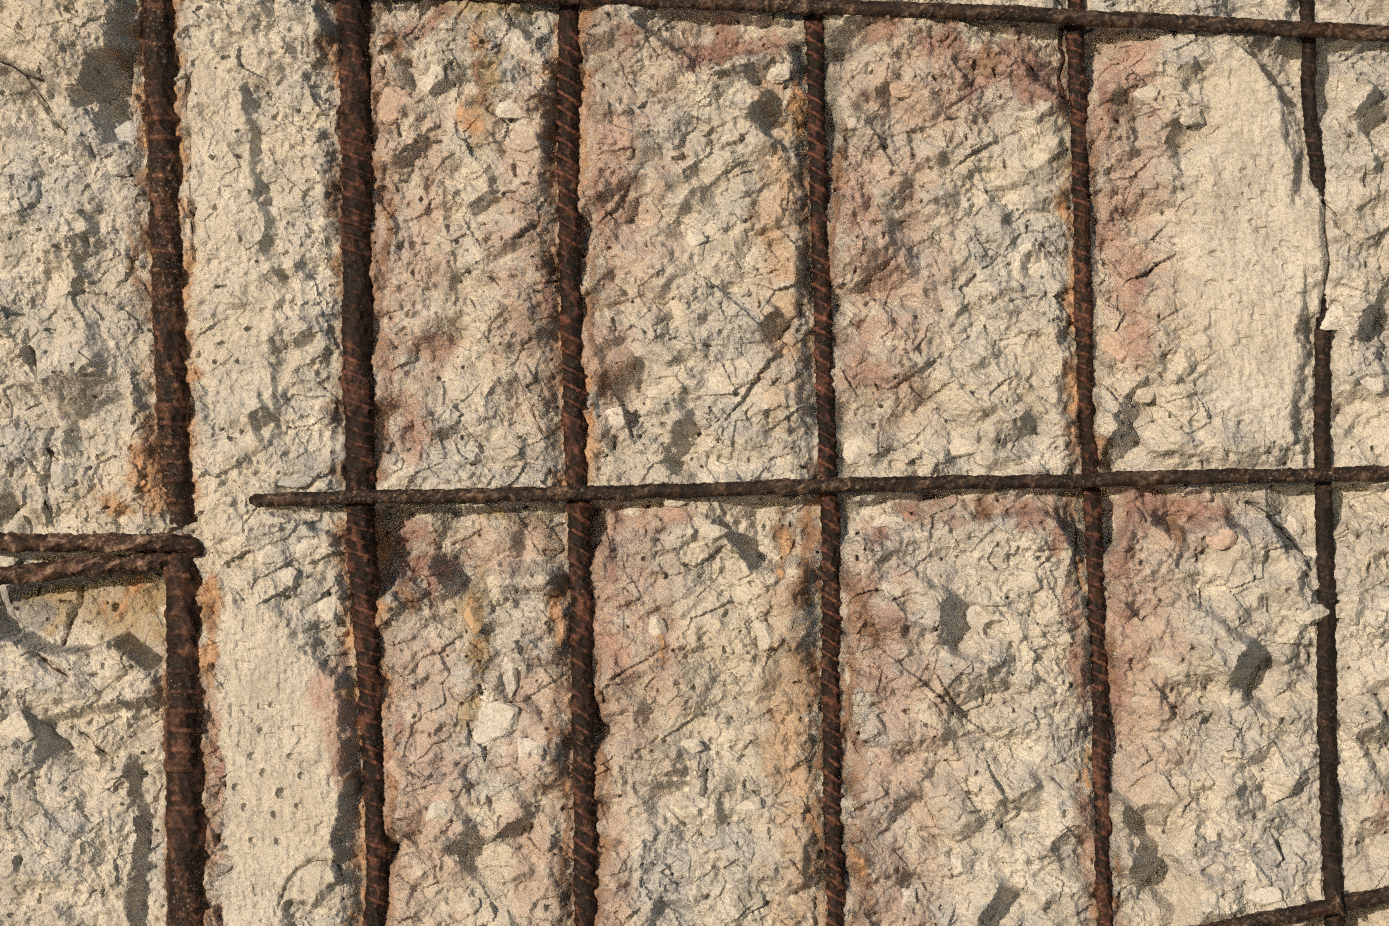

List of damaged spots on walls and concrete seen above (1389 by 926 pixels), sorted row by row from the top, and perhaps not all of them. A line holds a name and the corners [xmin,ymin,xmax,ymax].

crack [0,61,67,134]
rust [368,2,448,484]
rust [577,4,633,482]
rust [751,70,903,368]
spalling [328,0,1389,491]
rust [834,16,1069,118]
peeling [1181,37,1389,468]
crack [1322,196,1337,302]
rust [196,574,225,872]
rust [308,519,367,926]
rust [590,505,692,926]
spalling [382,482,1389,926]